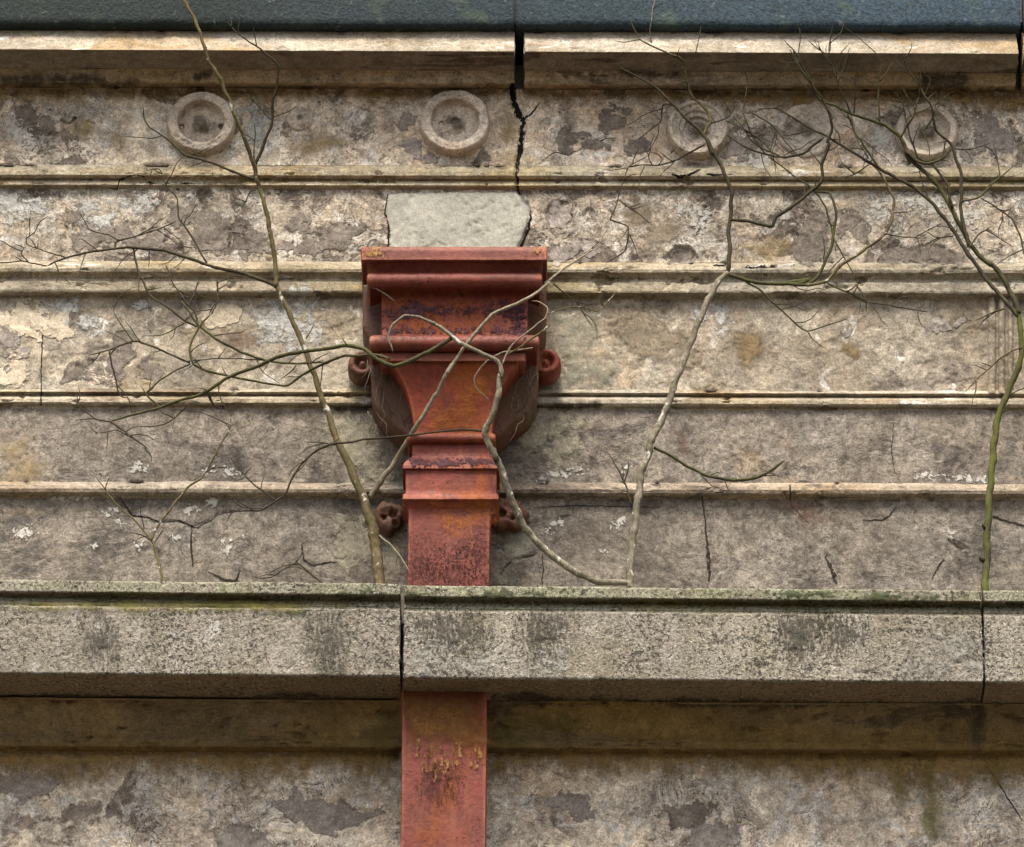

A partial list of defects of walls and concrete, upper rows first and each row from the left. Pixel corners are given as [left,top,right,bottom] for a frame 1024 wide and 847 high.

flaking render [555,102,651,161]
crack [509,83,613,247]
crack [120,497,240,583]
crack [301,543,337,566]
crack [701,496,711,582]
corrosion [403,691,484,745]
flaking render [0,768,65,808]
flaking render [213,821,275,847]
flaking render [271,786,386,837]